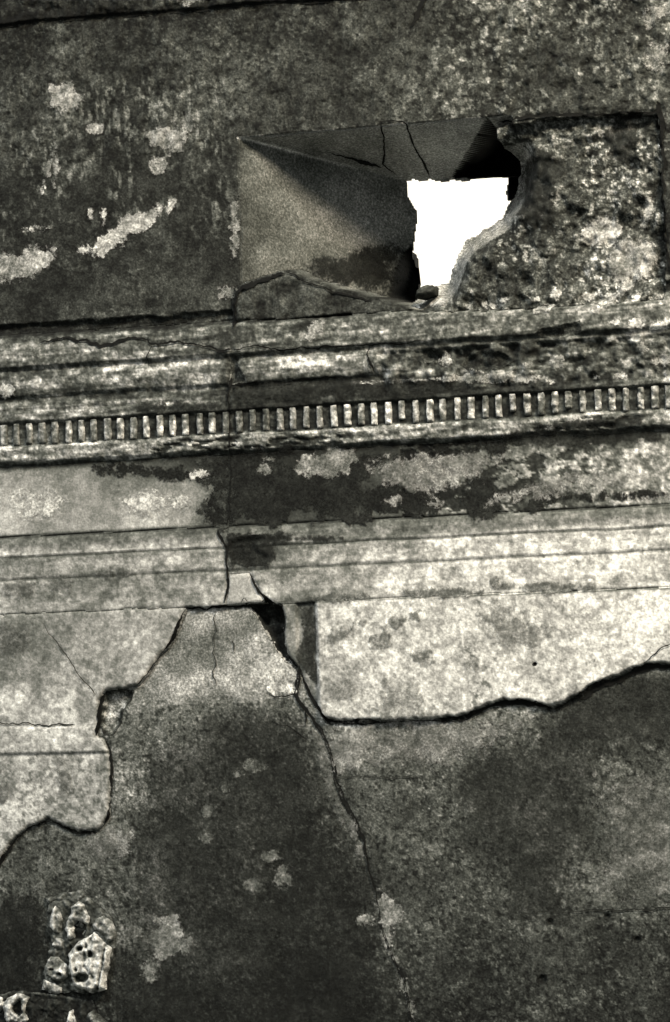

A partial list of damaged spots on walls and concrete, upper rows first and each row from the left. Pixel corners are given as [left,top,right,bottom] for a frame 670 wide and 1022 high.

water stain [537,417,642,429]
water stain [258,457,274,475]
water stain [295,444,358,479]
water stain [549,489,670,503]
spalling [226,534,299,670]
spalling [100,689,134,735]
water stain [331,678,520,775]
water stain [242,850,292,893]
crack [271,644,670,1022]
water stain [594,777,670,905]
water stain [139,914,193,984]
water stain [356,888,417,1017]